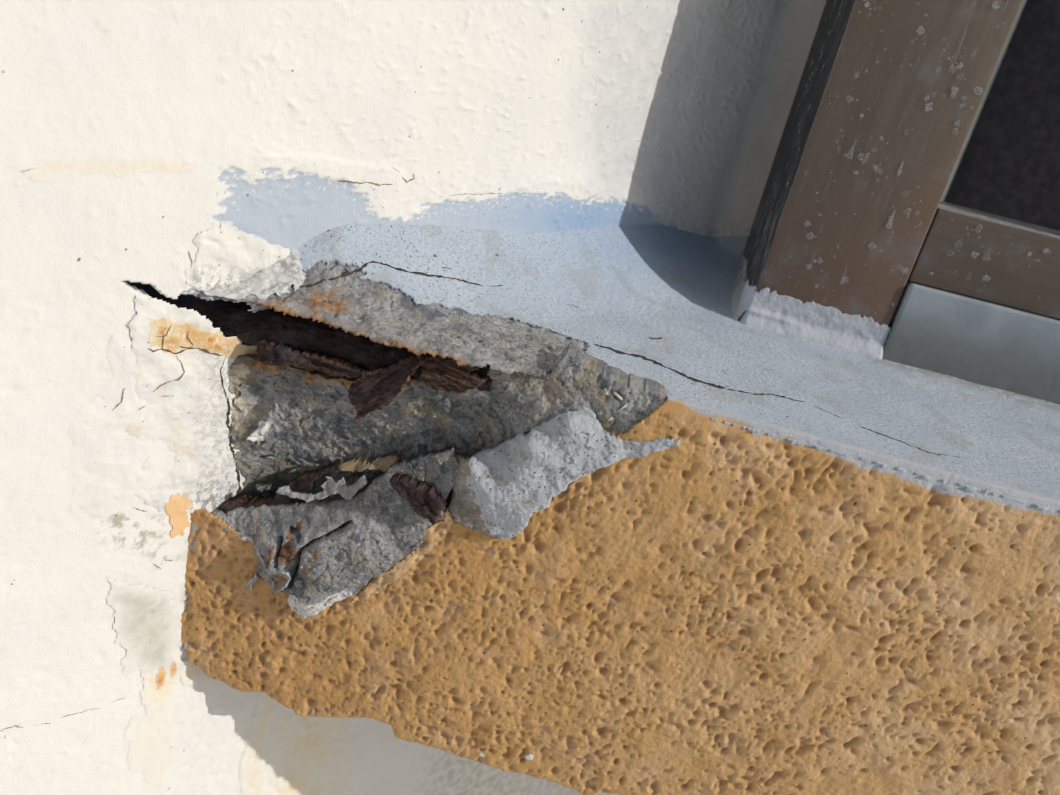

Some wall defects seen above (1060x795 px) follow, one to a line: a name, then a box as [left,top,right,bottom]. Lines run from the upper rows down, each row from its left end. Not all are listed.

crack [291,261,503,288]
corrosion [128,283,493,423]
spalling [125,220,681,619]
crack [595,337,962,458]
corrosion [218,460,341,514]
corrosion [389,472,446,525]